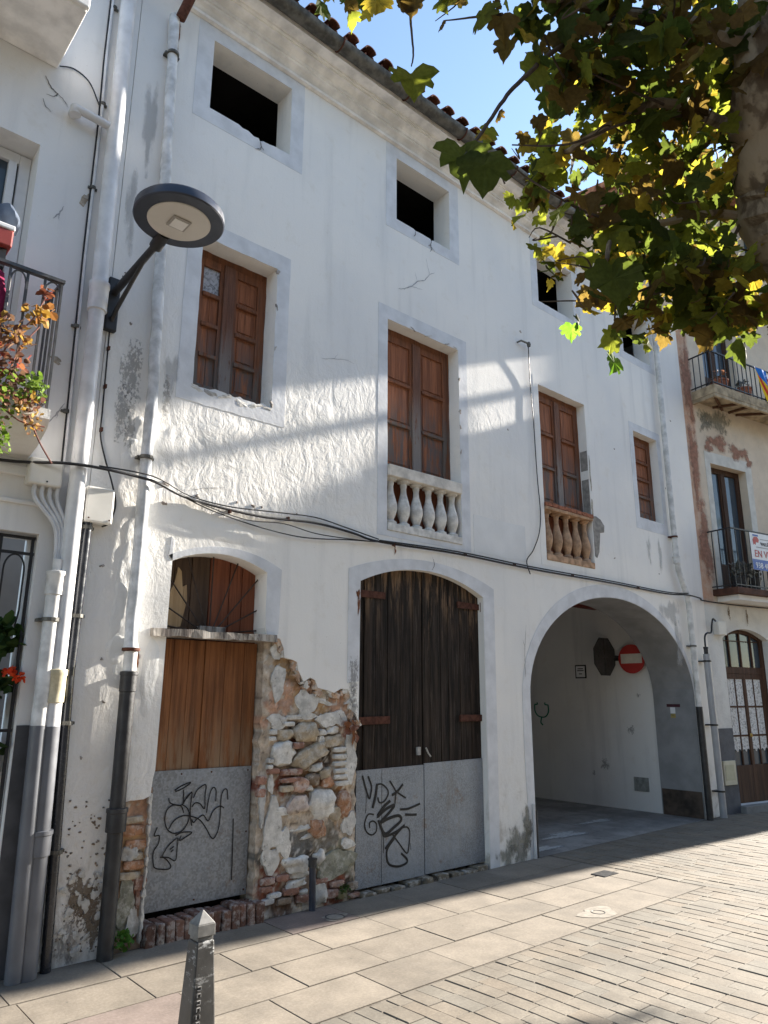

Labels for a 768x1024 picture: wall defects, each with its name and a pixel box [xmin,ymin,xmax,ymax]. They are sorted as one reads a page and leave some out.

peeling [680,348,752,575]
peeling [54,799,110,957]
spalling [113,787,153,954]
spalling [239,638,362,920]
damp [497,807,532,865]